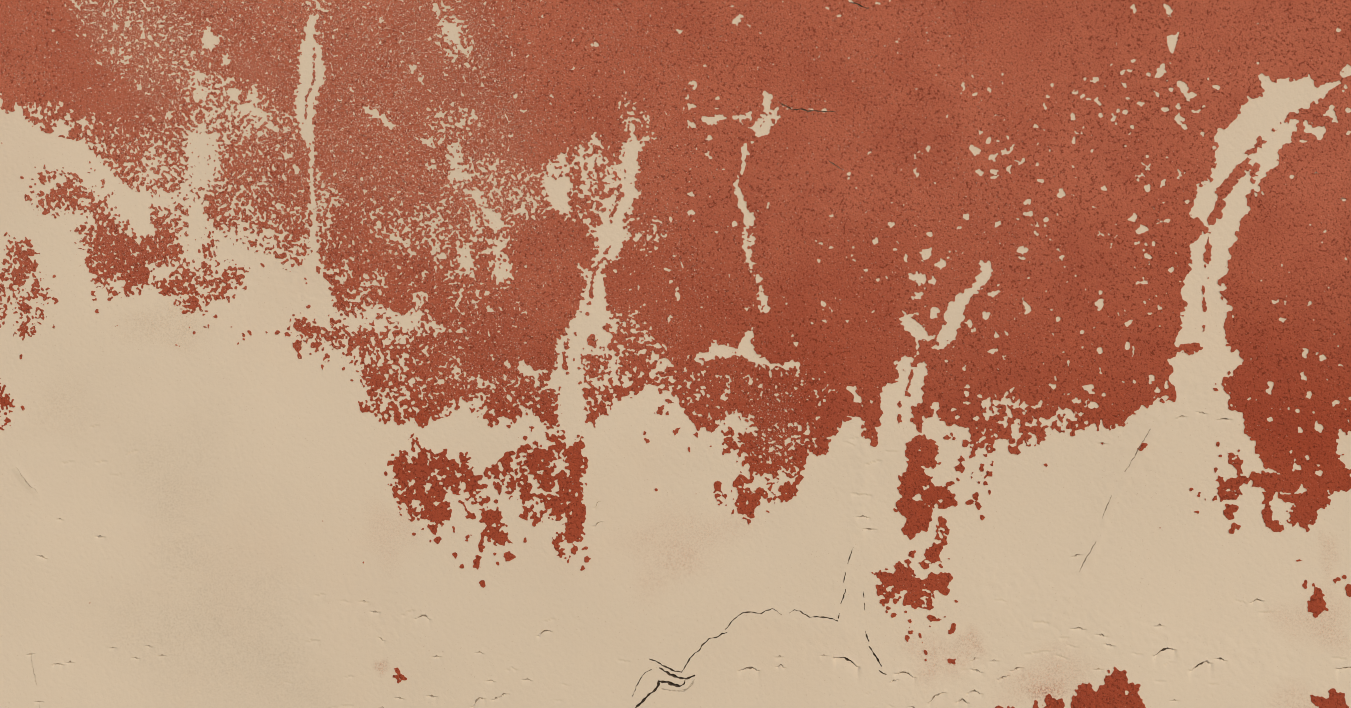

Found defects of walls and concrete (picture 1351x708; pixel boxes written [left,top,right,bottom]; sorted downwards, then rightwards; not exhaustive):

peeling [1072,32,1205,147]
peeling [678,65,792,313]
peeling [919,247,963,279]
peeling [969,124,1051,183]
peeling [984,188,1104,311]
peeling [1098,155,1186,327]
peeling [1288,333,1343,433]
peeling [1290,450,1323,476]
crack [632,433,887,708]